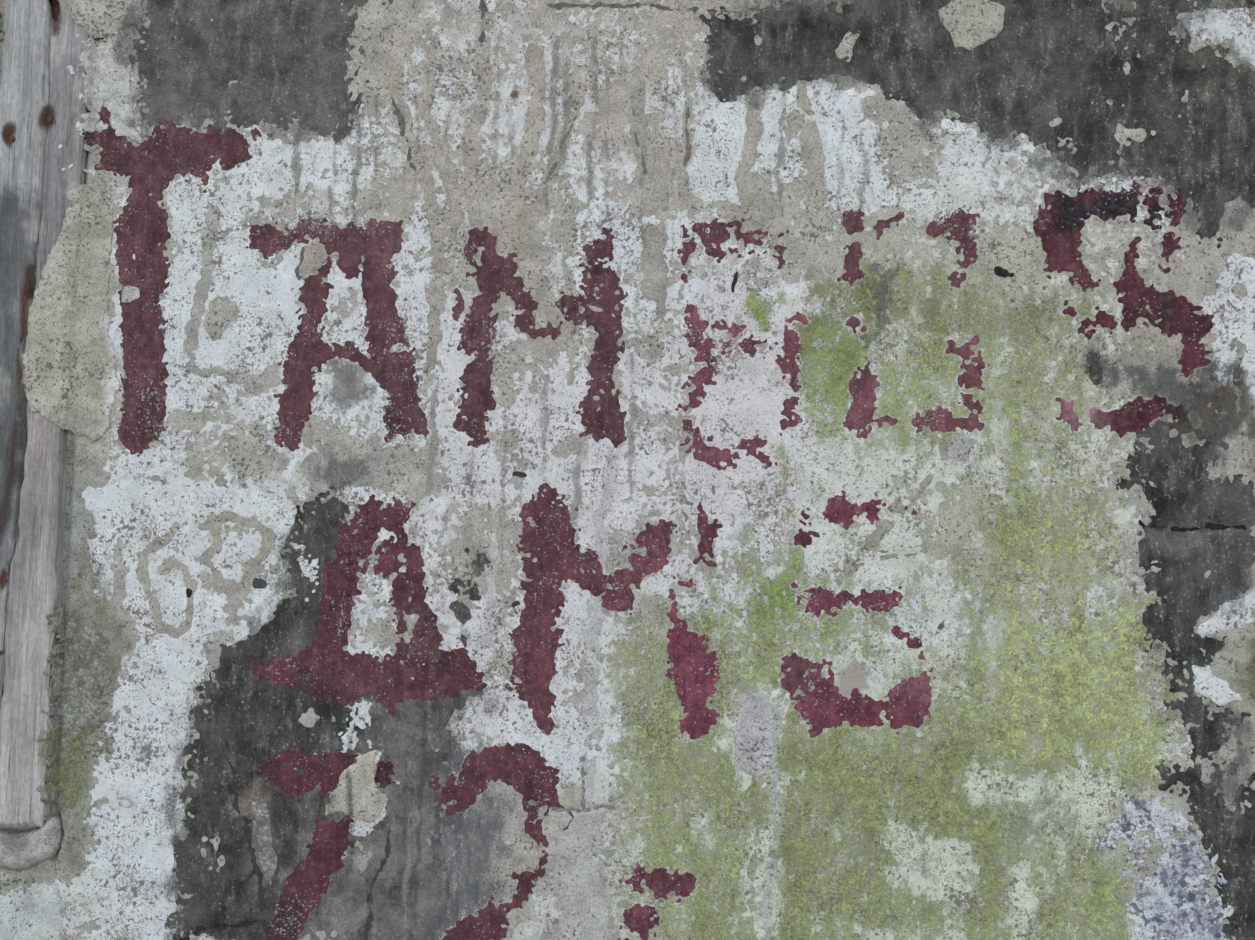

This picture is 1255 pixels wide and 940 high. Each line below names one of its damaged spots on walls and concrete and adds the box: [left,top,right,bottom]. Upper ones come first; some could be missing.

rust [2,124,15,145]
rust [39,105,54,129]
leakage [292,134,301,193]
leakage [352,110,376,219]
leakage [777,111,785,196]
peeling [62,162,140,393]
peeling [317,259,370,357]
peeling [211,521,263,583]
peeling [375,527,397,546]
peeling [344,565,415,658]
leakage [346,770,356,874]
leakage [1091,793,1234,940]